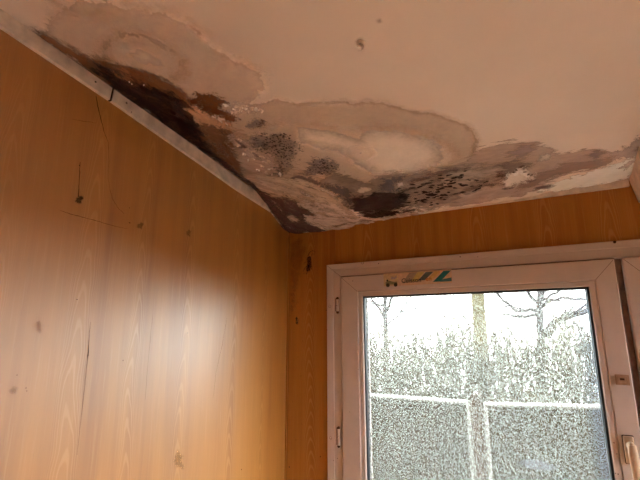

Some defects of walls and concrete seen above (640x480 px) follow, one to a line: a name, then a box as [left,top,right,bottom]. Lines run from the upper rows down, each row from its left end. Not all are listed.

leakage [34,4,640,219]
peeling [502,156,636,193]